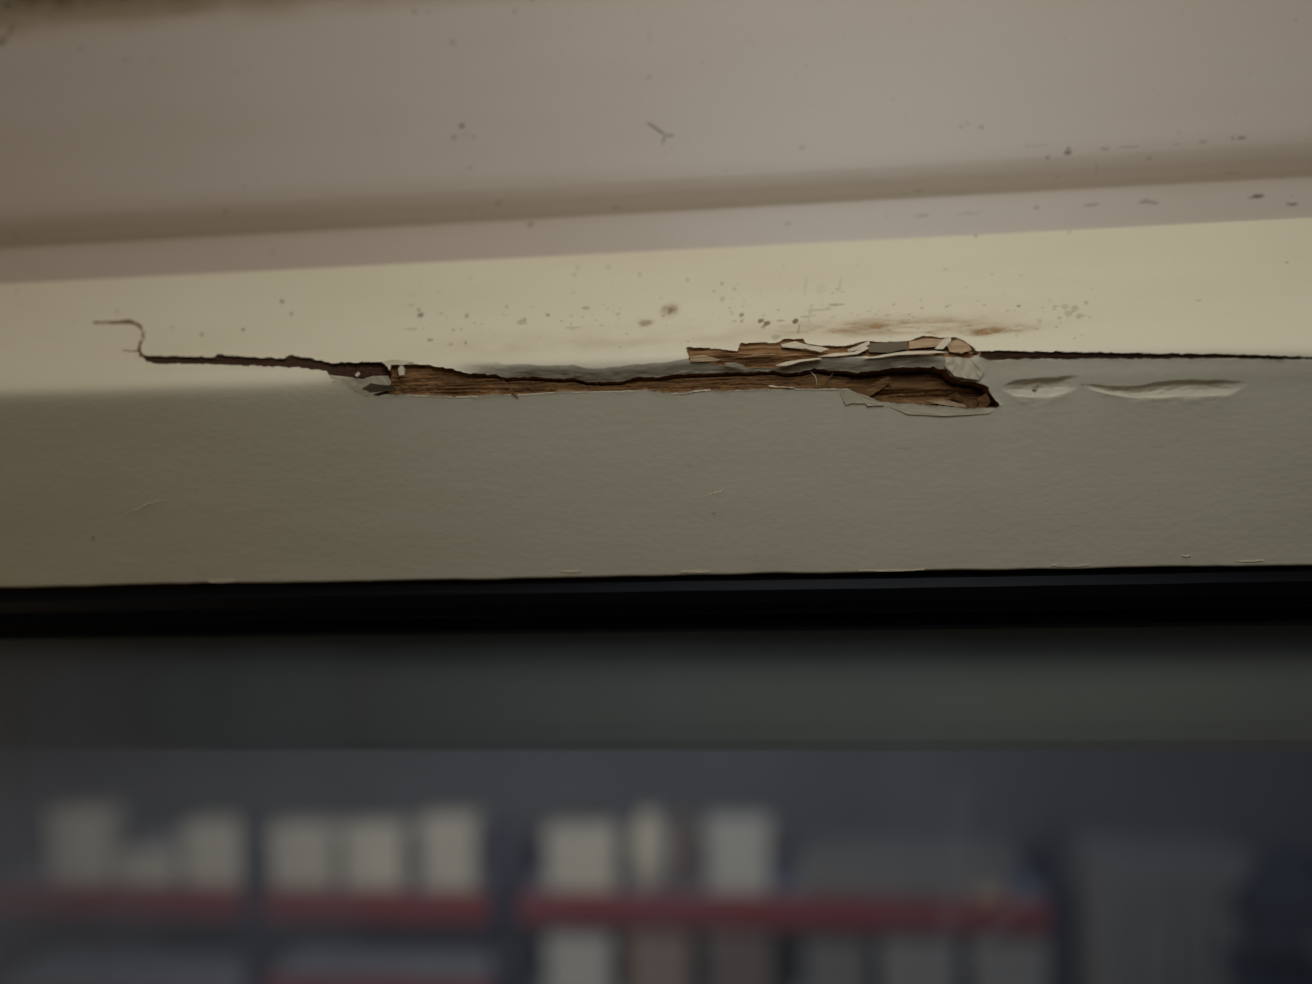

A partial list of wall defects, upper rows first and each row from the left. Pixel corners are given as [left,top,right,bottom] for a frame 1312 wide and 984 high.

crack [93,319,1312,416]
peeling [686,336,981,368]